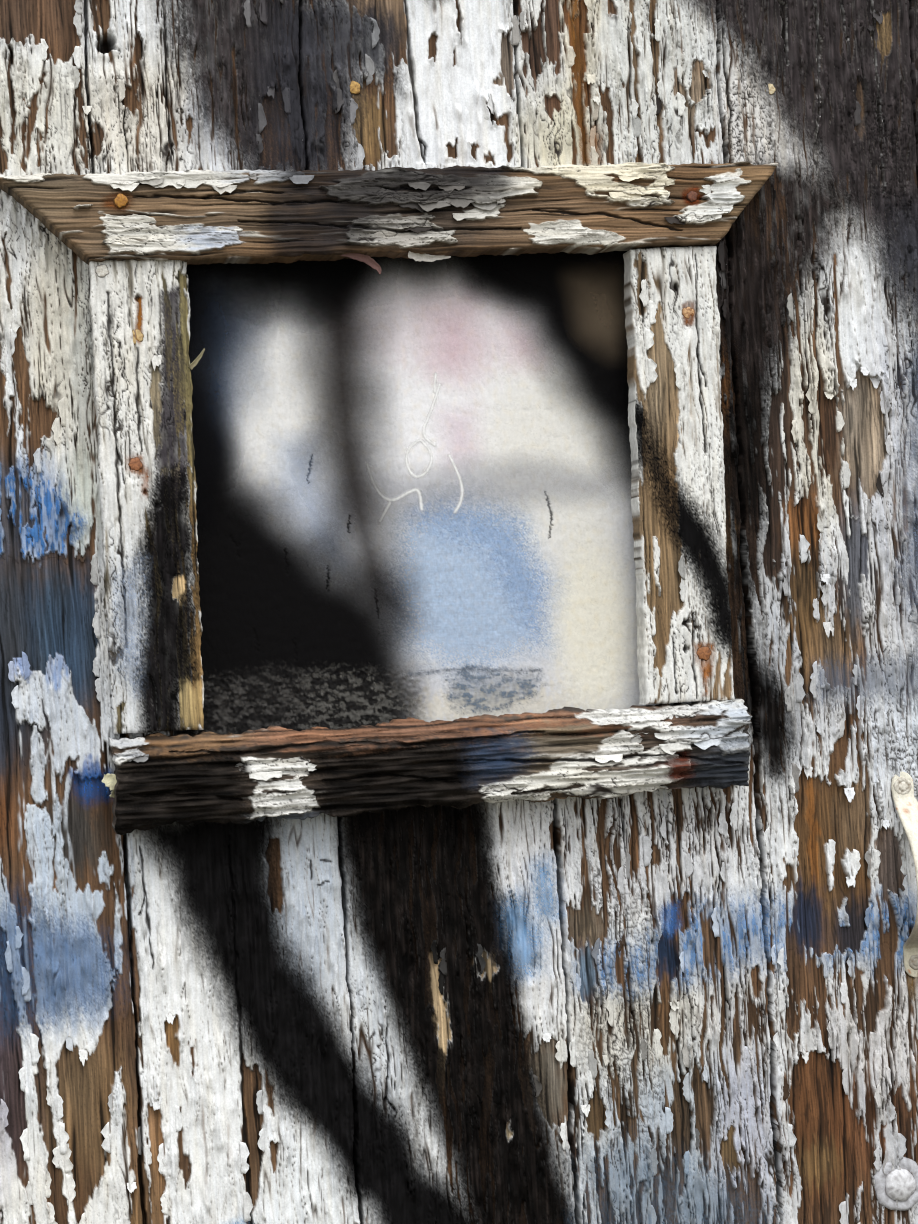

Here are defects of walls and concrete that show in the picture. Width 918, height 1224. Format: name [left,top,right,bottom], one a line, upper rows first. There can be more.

corrosion [683,187,702,205]
peeling [0,0,778,824]
peeling [0,194,193,1224]
corrosion [695,643,713,695]
peeling [529,270,918,1224]
peeling [428,939,452,1055]
peeling [473,944,499,982]
peeling [234,1051,288,1224]